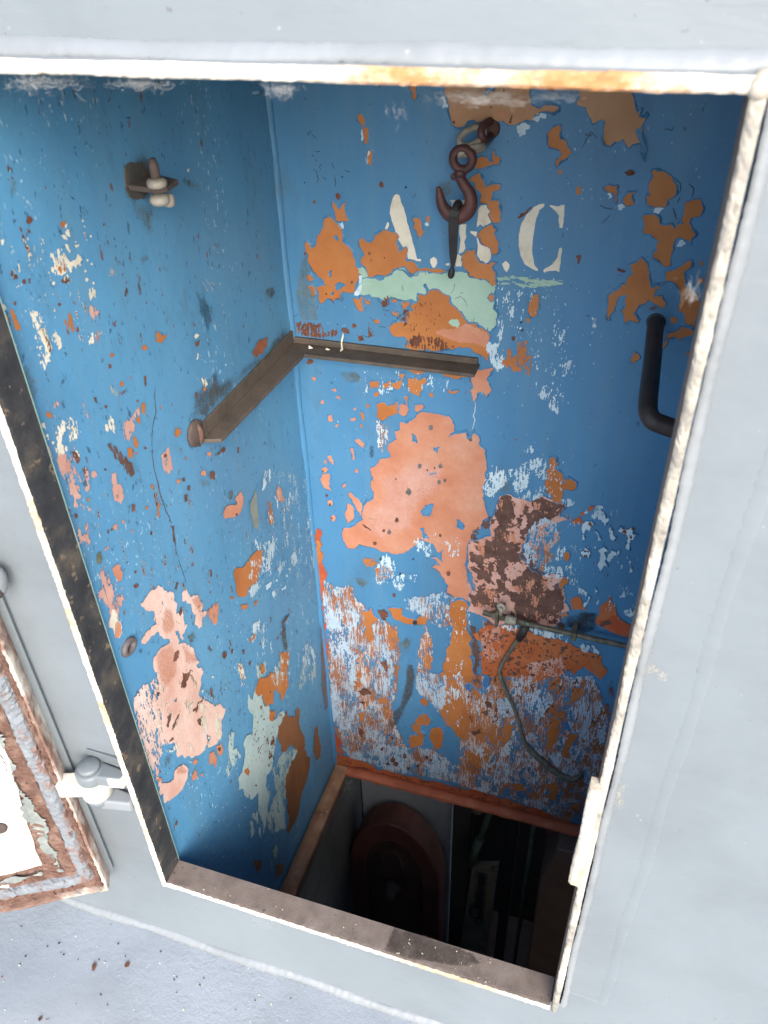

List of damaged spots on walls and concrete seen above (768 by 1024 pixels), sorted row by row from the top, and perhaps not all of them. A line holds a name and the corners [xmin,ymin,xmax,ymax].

peeling [440,86,572,176]
peeling [576,90,706,352]
peeling [134,149,639,879]
corrosion [467,495,612,736]